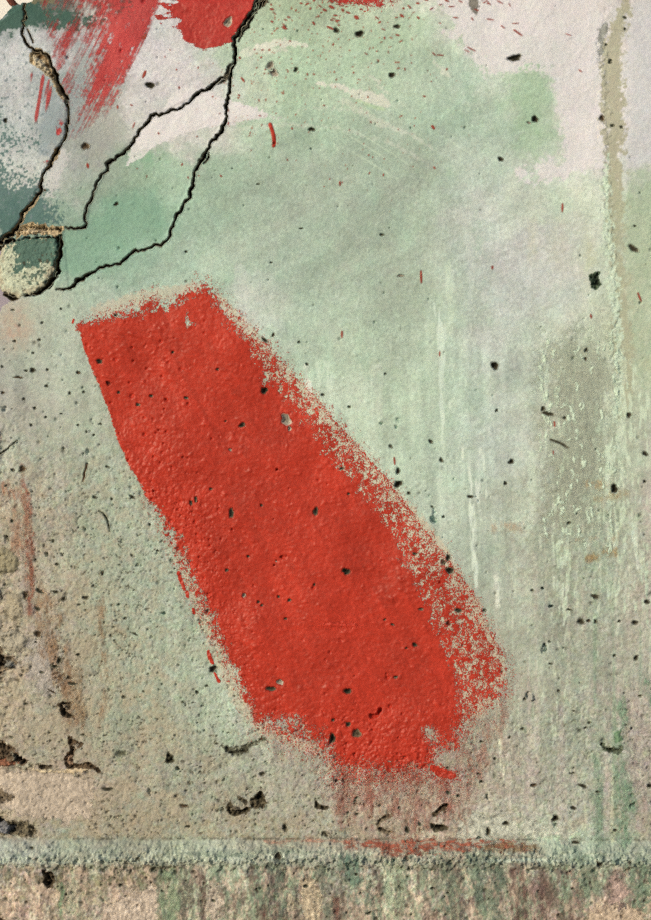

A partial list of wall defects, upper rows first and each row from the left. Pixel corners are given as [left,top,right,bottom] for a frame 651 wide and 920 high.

spalling [16,197,64,239]
crack [0,0,264,301]